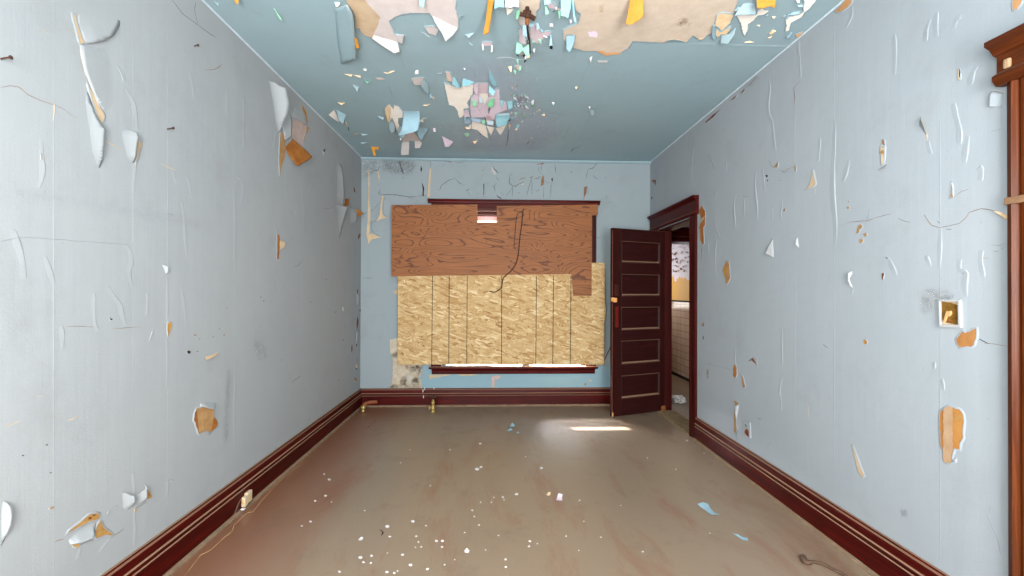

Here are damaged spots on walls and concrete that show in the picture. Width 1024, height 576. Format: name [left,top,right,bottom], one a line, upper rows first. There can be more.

peeling [334,0,817,155]
peeling [90,89,105,123]
peeling [279,105,309,172]
peeling [327,102,379,156]
crack [364,113,611,214]
peeling [358,168,386,244]
crack [845,189,1007,246]
flaking render [389,338,610,388]
peeling [956,328,976,347]
peeling [196,407,215,434]
peeling [939,408,964,462]
peeling [69,513,112,548]